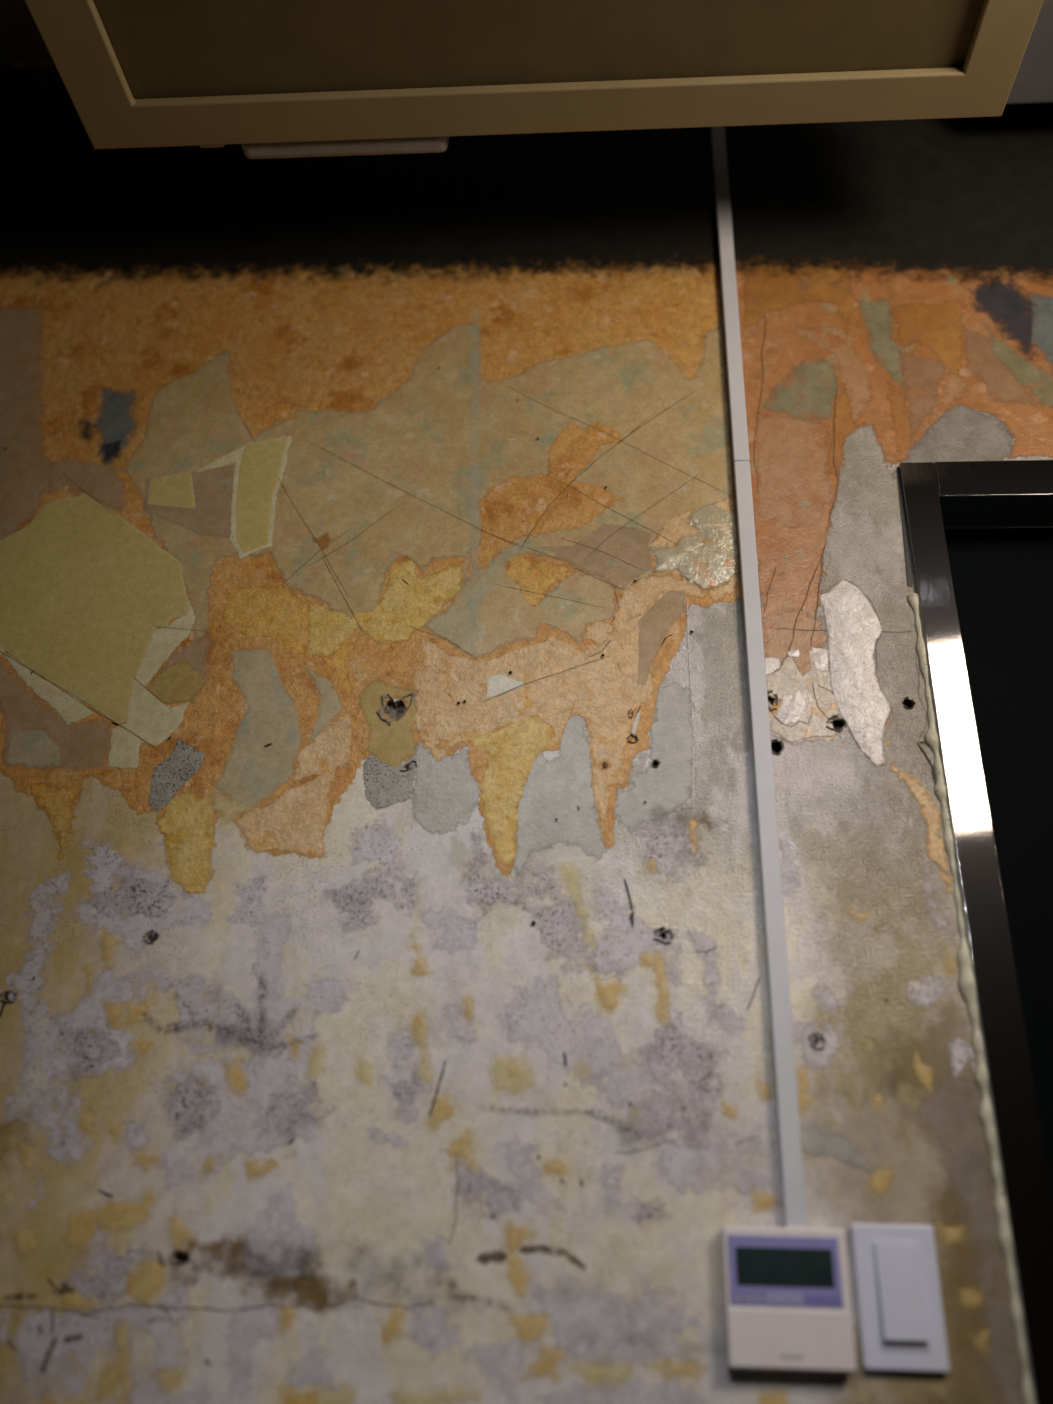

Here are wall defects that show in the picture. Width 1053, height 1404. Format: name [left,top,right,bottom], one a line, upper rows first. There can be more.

damp [974,280,1053,364]
flaking render [80,389,137,463]
peeling [754,412,832,528]
flaking render [148,738,205,812]
flaking render [234,560,778,1194]
flaking render [0,837,320,1187]
damp [170,1217,244,1282]
flaking render [0,1224,211,1404]
crack [0,1298,434,1321]
damp [267,1277,356,1327]